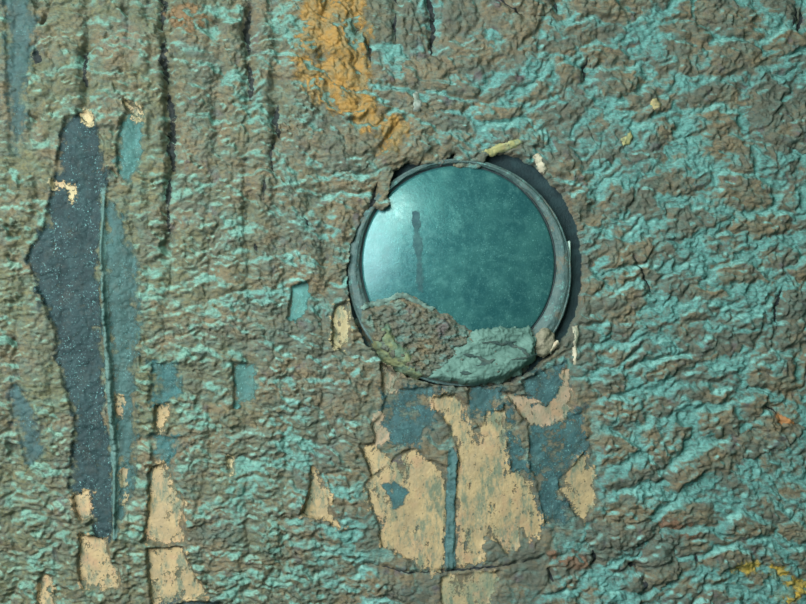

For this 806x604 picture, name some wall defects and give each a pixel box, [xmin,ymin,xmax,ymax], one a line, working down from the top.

crack [242,11,255,101]
crack [426,0,436,56]
crack [158,0,177,234]
crack [262,105,281,200]
spalling [24,98,219,604]
spalling [6,384,46,465]
peeling [299,465,349,532]
peeling [363,326,597,604]